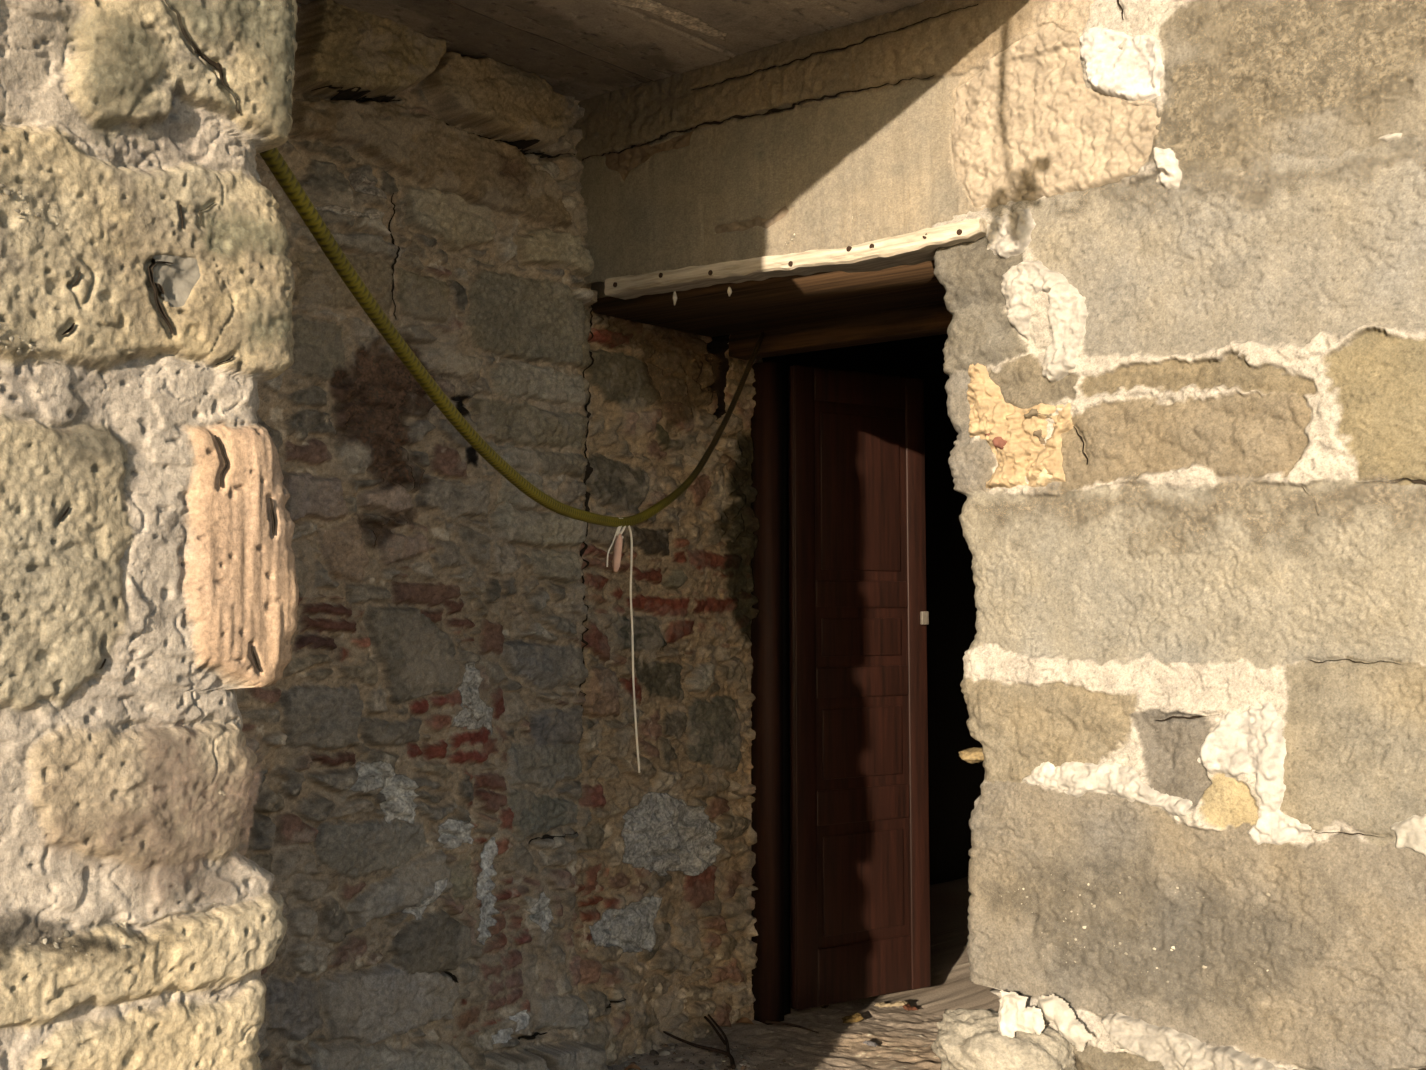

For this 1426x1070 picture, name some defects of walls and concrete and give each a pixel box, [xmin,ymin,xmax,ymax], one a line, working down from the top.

crack [164,0,240,114]
peeling [967,363,1074,489]